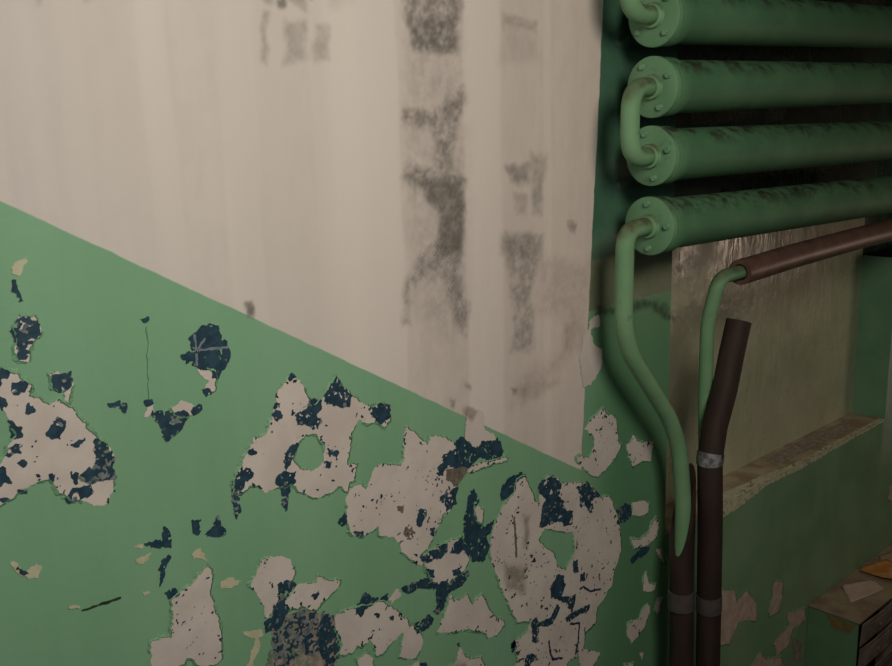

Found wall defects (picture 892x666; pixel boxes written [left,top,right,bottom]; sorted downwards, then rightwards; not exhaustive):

peeling [0,257,117,508]
peeling [107,400,128,413]
peeling [144,323,231,442]
peeling [579,315,603,387]
peeling [134,372,667,666]
peeling [10,561,42,579]
peeling [721,579,806,666]